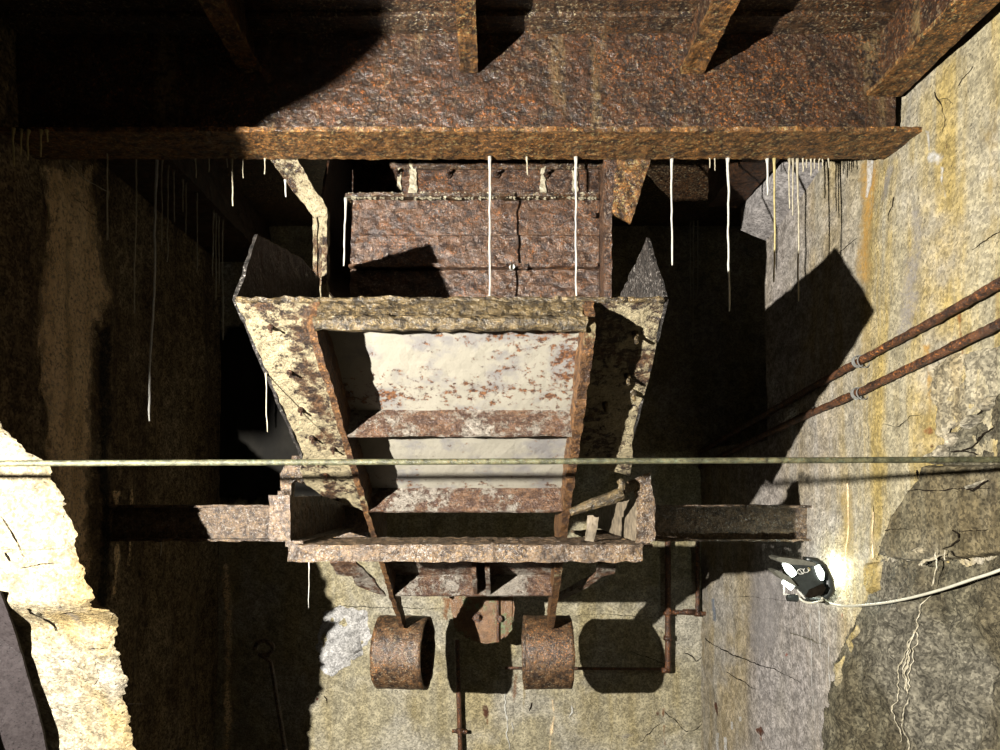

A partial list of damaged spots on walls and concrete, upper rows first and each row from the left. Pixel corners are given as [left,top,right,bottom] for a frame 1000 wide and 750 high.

efflorescence [396,159,418,193]
efflorescence [539,159,547,193]
crack [908,470,988,492]
crack [943,529,987,561]